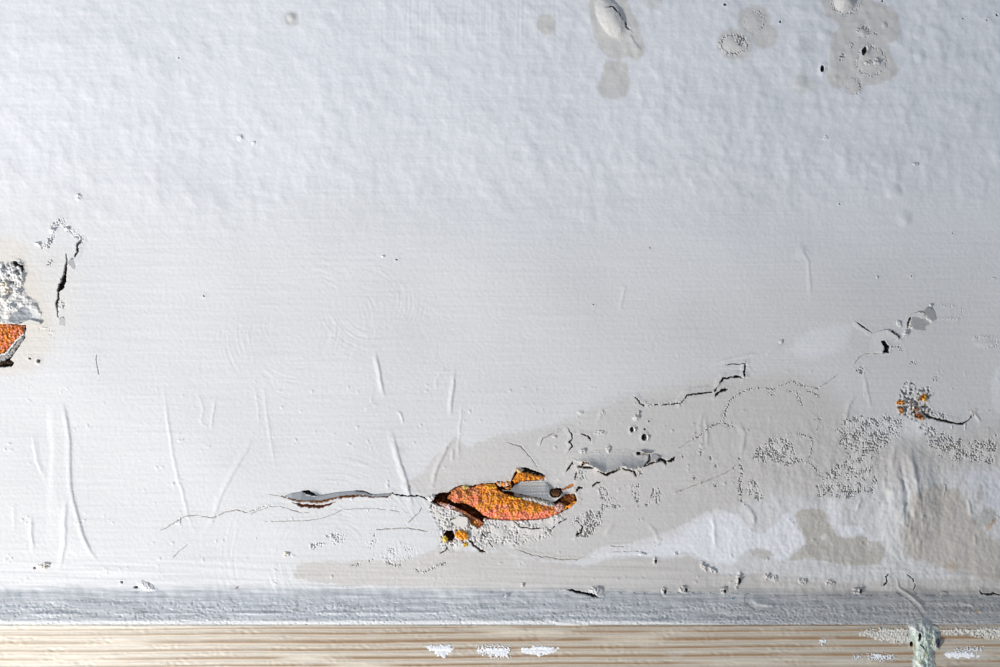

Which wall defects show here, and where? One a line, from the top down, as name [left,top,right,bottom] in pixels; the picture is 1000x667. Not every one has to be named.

damp [535,13,557,36]
damp [587,0,638,102]
damp [617,0,663,42]
spalling [0,256,55,371]
crack [49,238,87,326]
peeling [896,302,967,338]
crack [502,359,842,482]
crack [151,485,436,564]
spalling [350,462,666,570]
damp [293,360,1000,598]